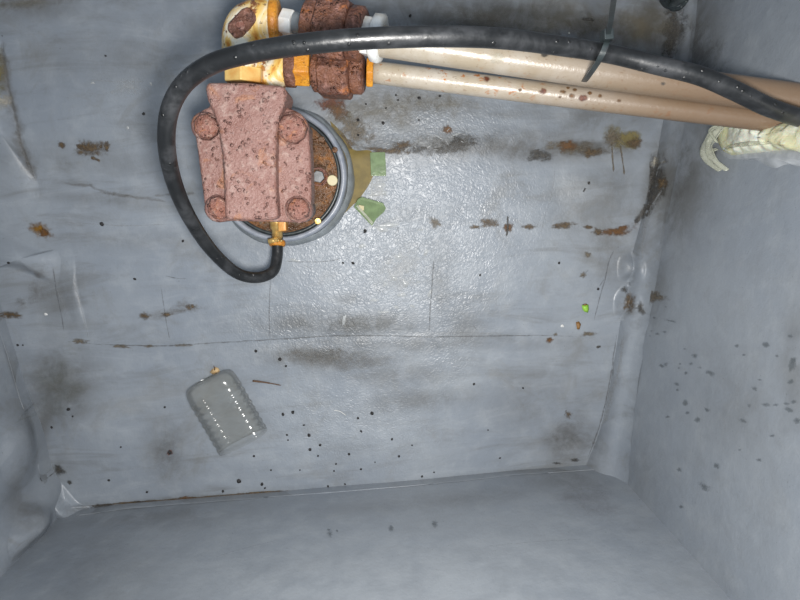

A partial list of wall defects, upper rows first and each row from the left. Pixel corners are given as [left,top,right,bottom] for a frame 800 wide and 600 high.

rust [77,142,109,162]
rust [528,140,602,161]
rust [585,157,667,235]
rust [31,224,50,236]
rust [470,216,512,236]